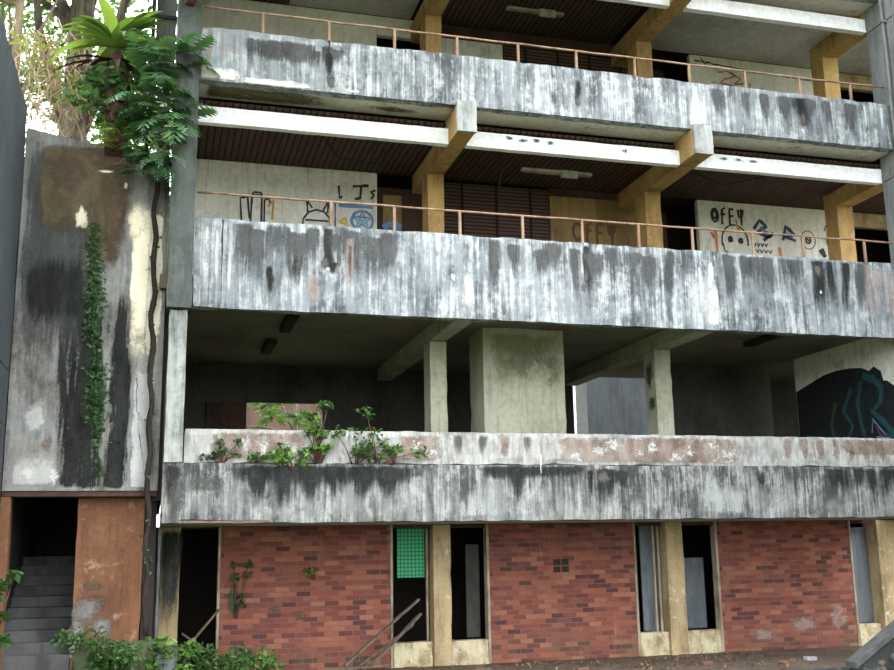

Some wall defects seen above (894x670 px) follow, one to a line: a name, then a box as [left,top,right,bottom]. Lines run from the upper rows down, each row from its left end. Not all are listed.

water stain [247,38,344,65]
water stain [206,85,324,105]
water stain [202,223,397,291]
water stain [489,239,520,283]
water stain [533,243,675,292]
water stain [464,274,474,306]
water stain [21,149,132,488]
water stain [238,466,411,503]
water stain [461,466,628,516]